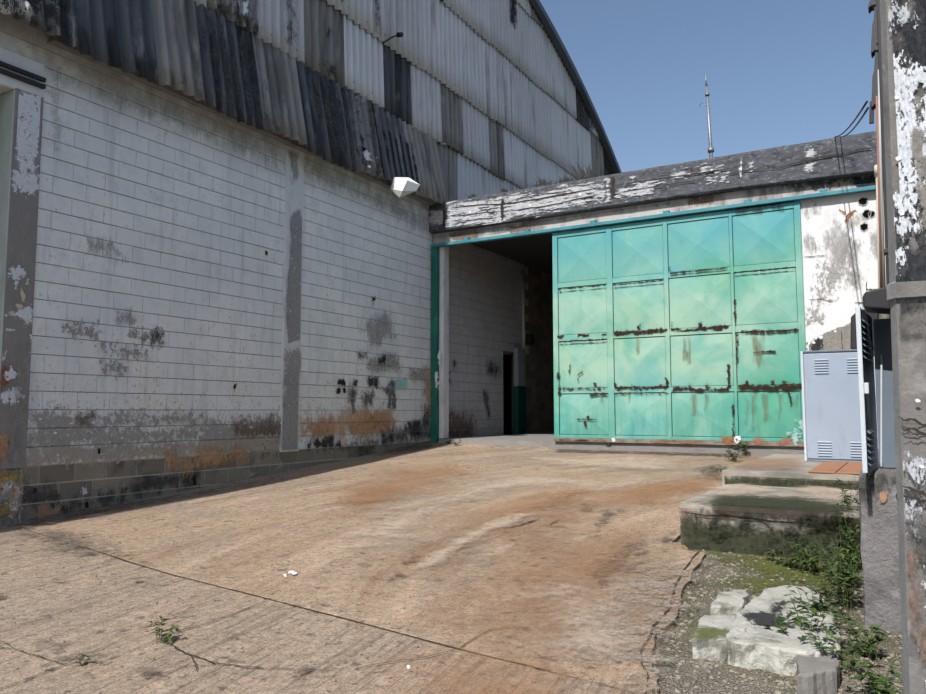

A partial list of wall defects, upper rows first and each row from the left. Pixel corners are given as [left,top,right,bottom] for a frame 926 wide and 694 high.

peeling [888,0,919,32]
peeling [11,86,41,199]
peeling [893,50,926,276]
leakage [810,222,859,306]
peeling [1,351,25,406]
peeling [26,209,302,459]
leakage [306,368,441,455]
corrosion [556,299,802,407]
corrosion [707,404,736,445]
crack [898,416,926,436]
leakage [6,469,219,557]
crack [903,486,926,502]